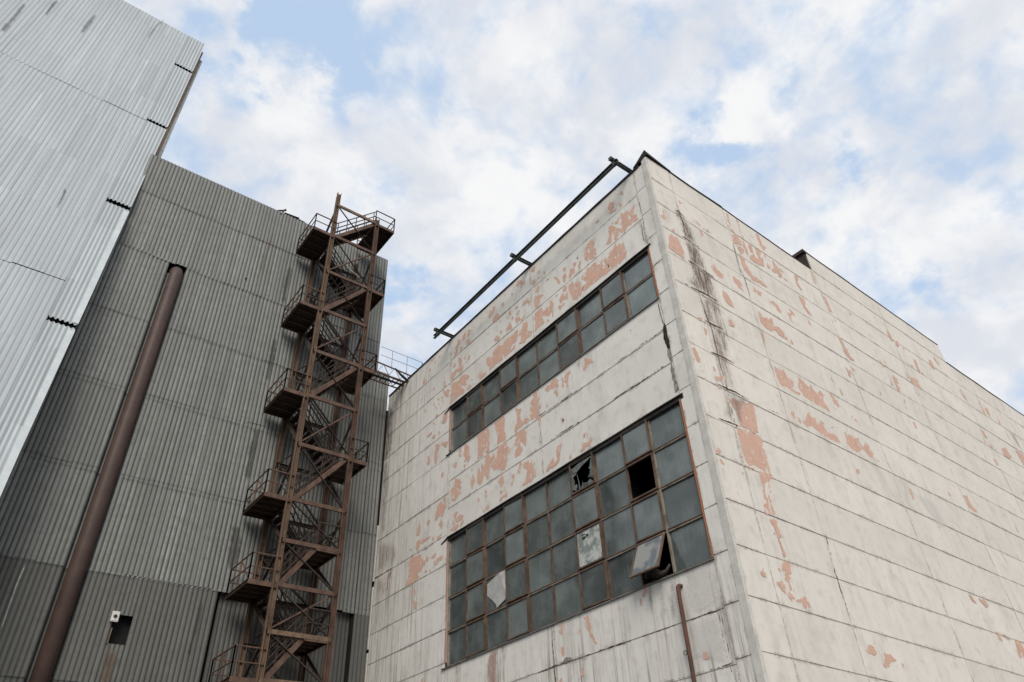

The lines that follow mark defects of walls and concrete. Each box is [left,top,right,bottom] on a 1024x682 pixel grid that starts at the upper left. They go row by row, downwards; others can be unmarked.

peeling [661,211,686,259]
leakage [677,214,719,320]
peeling [712,213,816,344]
peeling [406,191,637,609]
spalling [663,325,679,392]
peeling [774,366,880,462]
peeling [879,356,939,403]
peeling [981,430,1024,466]
peeling [729,398,811,611]